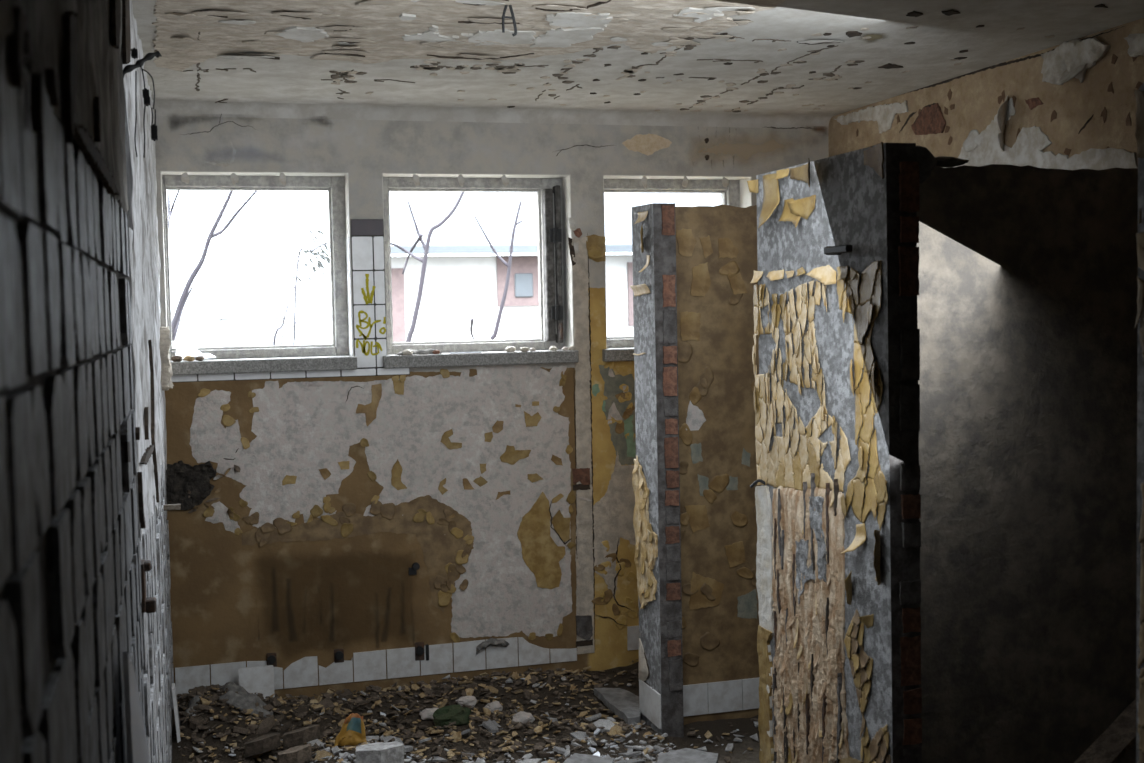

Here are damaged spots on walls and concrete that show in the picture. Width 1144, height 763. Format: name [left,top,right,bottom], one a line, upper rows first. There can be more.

peeling [835,81,1144,179]
peeling [1041,33,1144,85]
peeling [1134,208,1144,358]
peeling [591,205,709,630]
peeling [166,364,575,643]
spalling [737,260,922,763]
peeling [639,638,648,682]